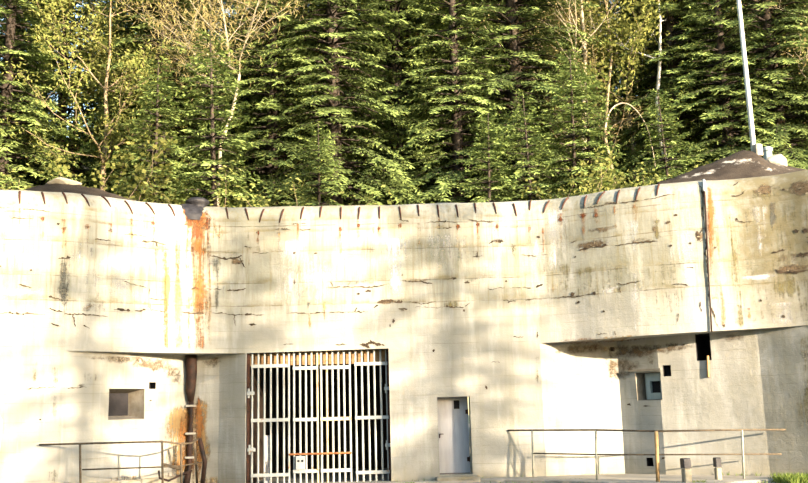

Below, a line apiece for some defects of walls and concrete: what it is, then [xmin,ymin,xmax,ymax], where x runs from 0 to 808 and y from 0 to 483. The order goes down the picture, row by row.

corrosion [707,187,720,263]
spalling [754,185,771,195]
water stain [59,263,68,301]
corrosion [162,210,220,347]
corrosion [167,398,210,475]